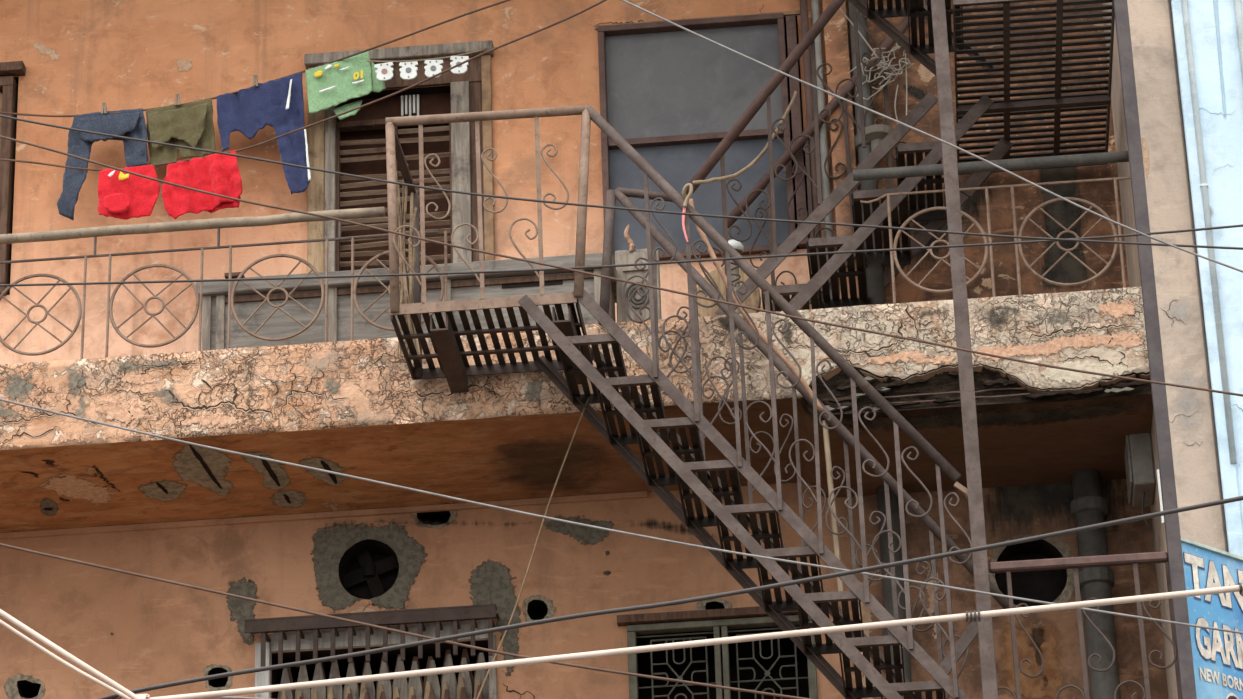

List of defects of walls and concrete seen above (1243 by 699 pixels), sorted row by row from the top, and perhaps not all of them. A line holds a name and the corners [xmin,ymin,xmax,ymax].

crack [782,305,939,367]
crack [1024,299,1186,367]
crack [359,353,501,413]
crack [0,361,351,502]
peeling [40,467,117,516]
water stain [504,443,599,489]